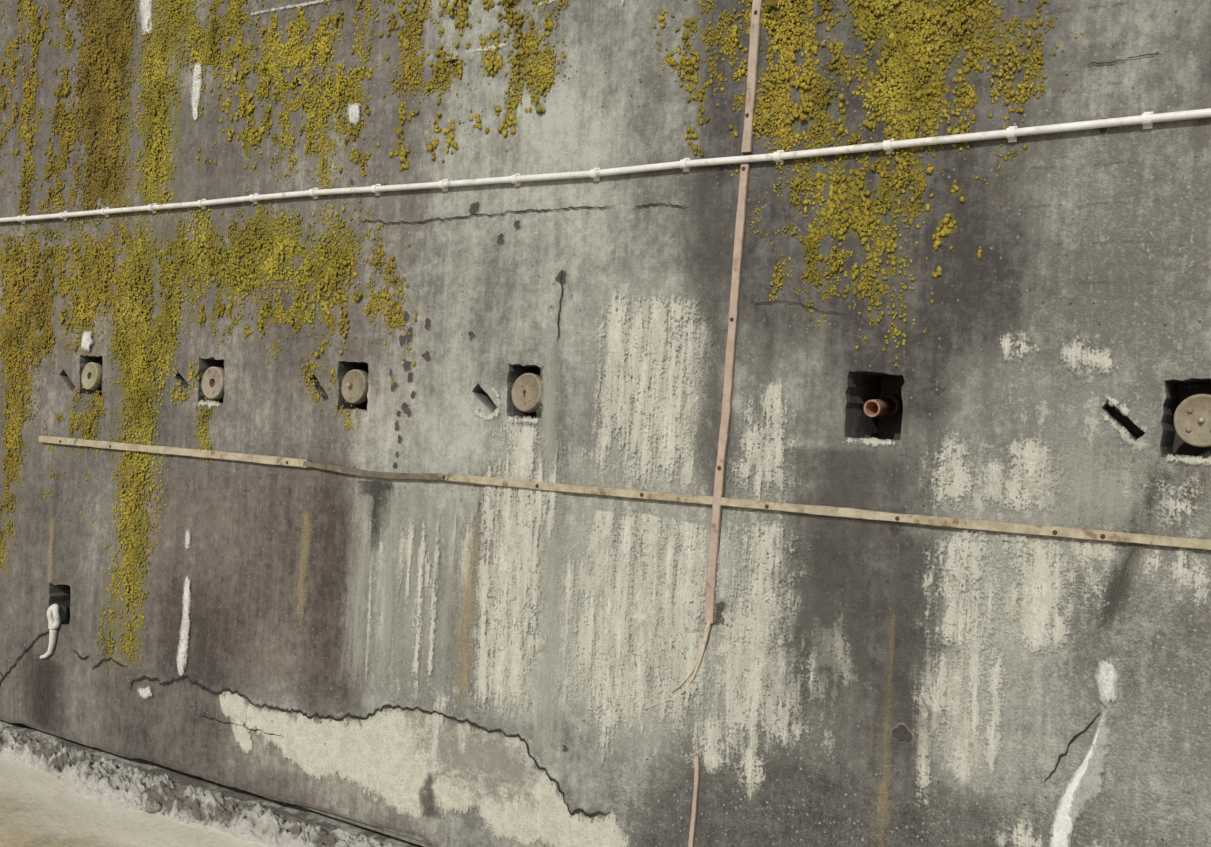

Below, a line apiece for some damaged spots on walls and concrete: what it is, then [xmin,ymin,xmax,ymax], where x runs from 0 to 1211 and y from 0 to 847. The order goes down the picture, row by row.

crack [1088,53,1164,65]
leakage [581,289,717,492]
leakage [1000,332,1039,361]
leakage [1061,336,1118,373]
crack [0,630,50,683]
leakage [176,576,191,676]
leakage [349,359,858,800]
leakage [909,435,1211,807]
crack [74,648,613,817]
spalling [217,690,630,847]
leakage [997,817,1047,847]